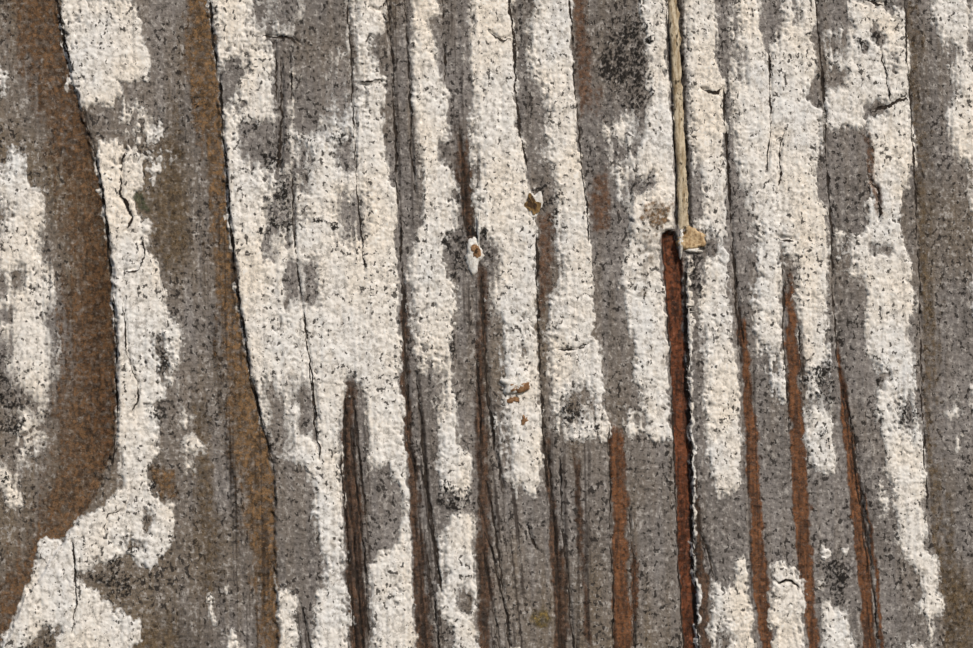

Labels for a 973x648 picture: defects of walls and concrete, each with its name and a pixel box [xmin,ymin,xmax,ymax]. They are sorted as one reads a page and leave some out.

leakage [0,0,116,648]
crack [347,0,442,648]
peeling [206,0,675,648]
leakage [543,439,570,648]
crack [528,237,589,648]
leakage [574,0,664,119]
rust [662,230,697,648]
rust [737,319,772,648]
rust [784,277,820,648]
peeling [681,0,945,648]
crack [867,0,929,509]
peeling [943,384,973,421]